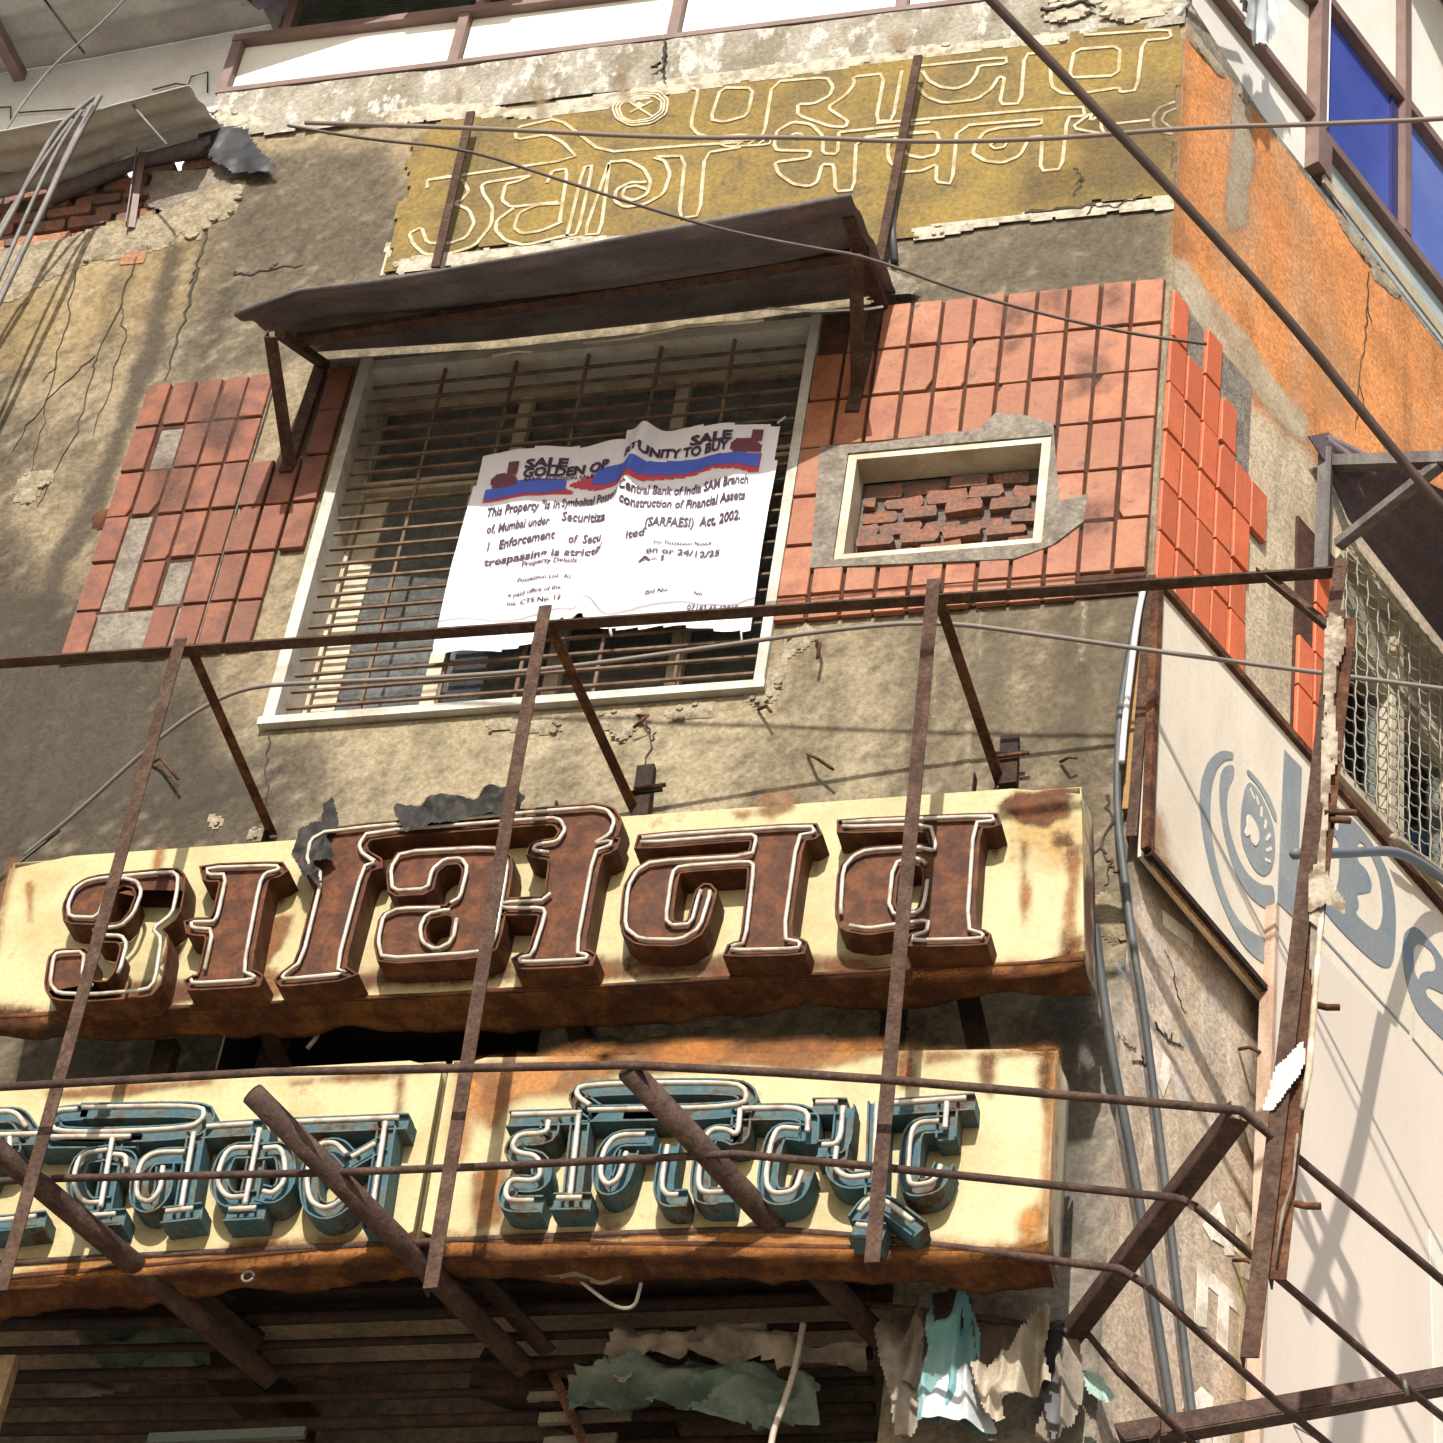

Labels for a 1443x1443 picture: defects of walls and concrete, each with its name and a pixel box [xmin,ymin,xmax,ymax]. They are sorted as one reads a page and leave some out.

peeling [208,109,269,127]
peeling [376,0,1172,123]
peeling [1187,20,1254,229]
spalling [0,164,263,302]
peeling [380,235,624,276]
peeling [911,195,1174,240]
crack [1329,195,1372,430]
spalling [1337,209,1402,298]
crack [12,257,137,506]
crack [1117,950,1186,1068]